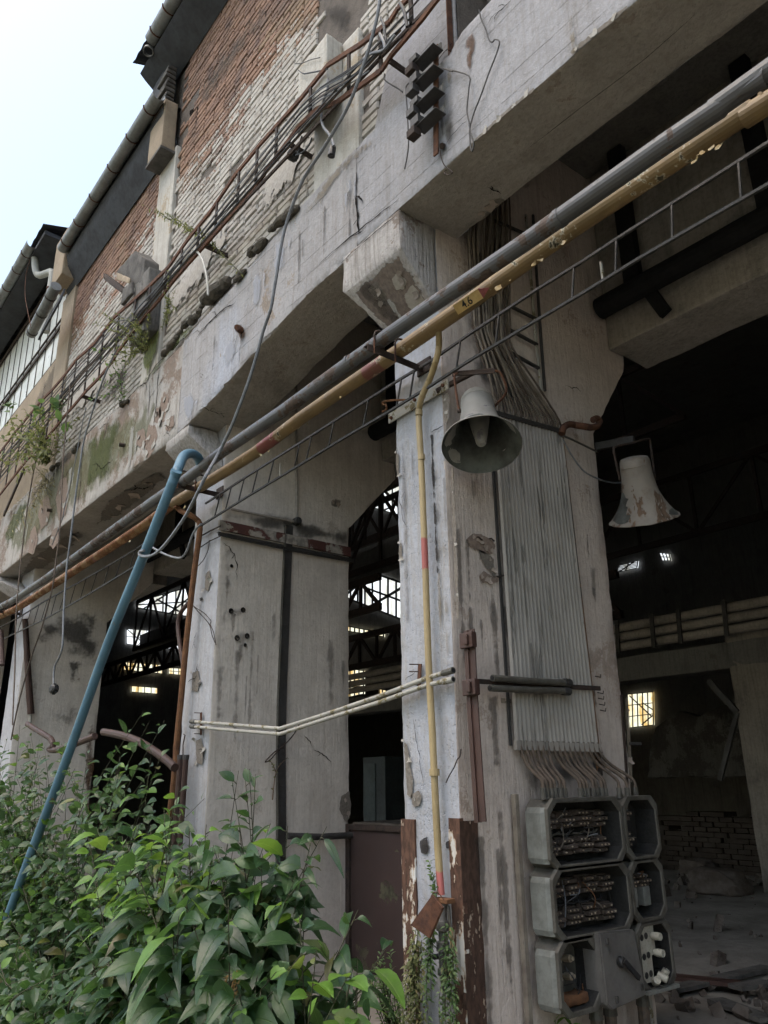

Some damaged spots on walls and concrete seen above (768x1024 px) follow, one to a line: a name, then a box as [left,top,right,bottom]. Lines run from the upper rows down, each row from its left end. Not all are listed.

rust [466,35,474,68]
crack [322,173,396,263]
peeling [356,257,425,326]
water stain [128,427,137,467]
peeling [136,392,174,458]
rust [201,520,355,563]
spalling [451,467,504,619]